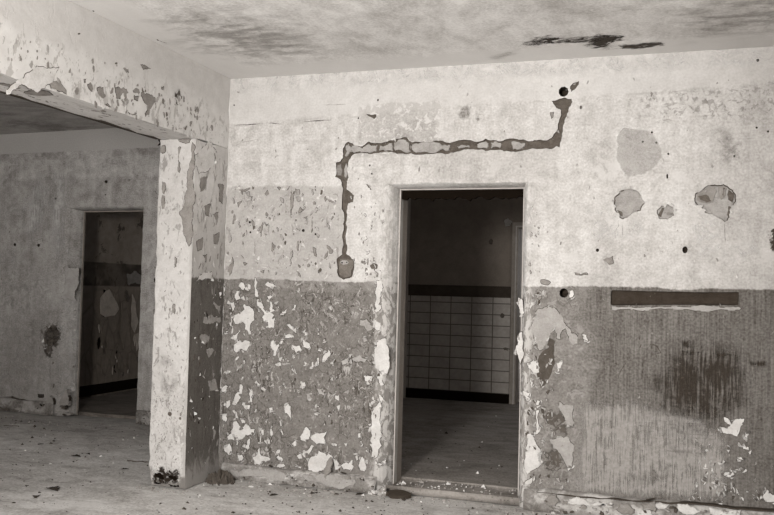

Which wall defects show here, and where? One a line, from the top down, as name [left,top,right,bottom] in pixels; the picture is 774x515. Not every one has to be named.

damp [523,34,664,49]
flaking render [612,186,645,219]
flaking render [657,204,676,220]
flaking render [688,183,736,222]
peeling [0,38,390,496]
peeling [503,263,678,515]
damp [578,341,765,498]